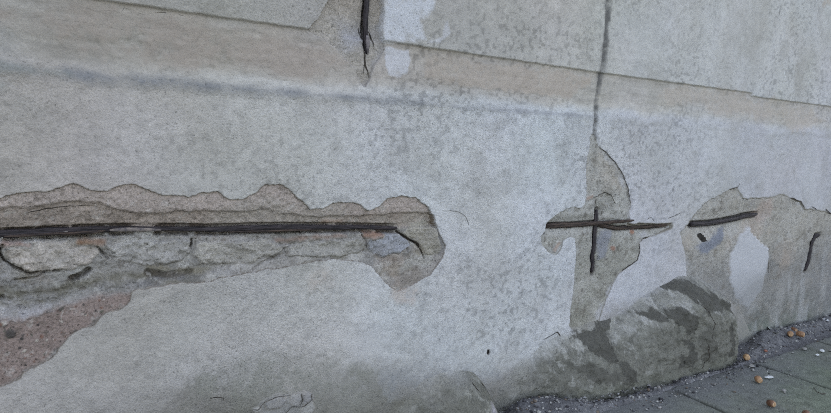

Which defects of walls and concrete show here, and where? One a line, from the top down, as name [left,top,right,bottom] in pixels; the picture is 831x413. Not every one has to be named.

peeling [0,0,384,87]
spalling [0,184,445,387]
spalling [541,135,669,327]
peeling [680,184,831,336]